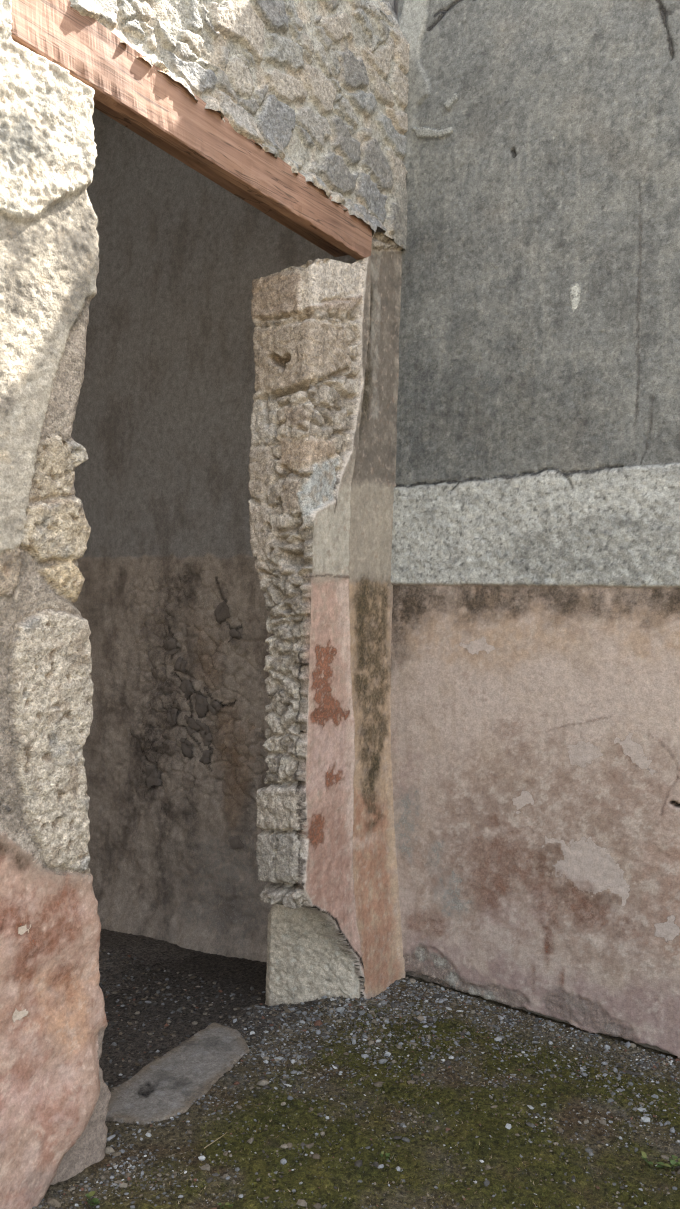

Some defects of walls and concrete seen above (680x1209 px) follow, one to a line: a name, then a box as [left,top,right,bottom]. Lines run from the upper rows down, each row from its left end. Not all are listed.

leakage [357,580,445,824]
flaking render [614,733,658,776]
flaking render [512,788,534,814]
flaking render [542,836,630,906]
flaking render [654,915,680,943]
spalling [403,946,528,1008]
spalling [543,990,635,1042]